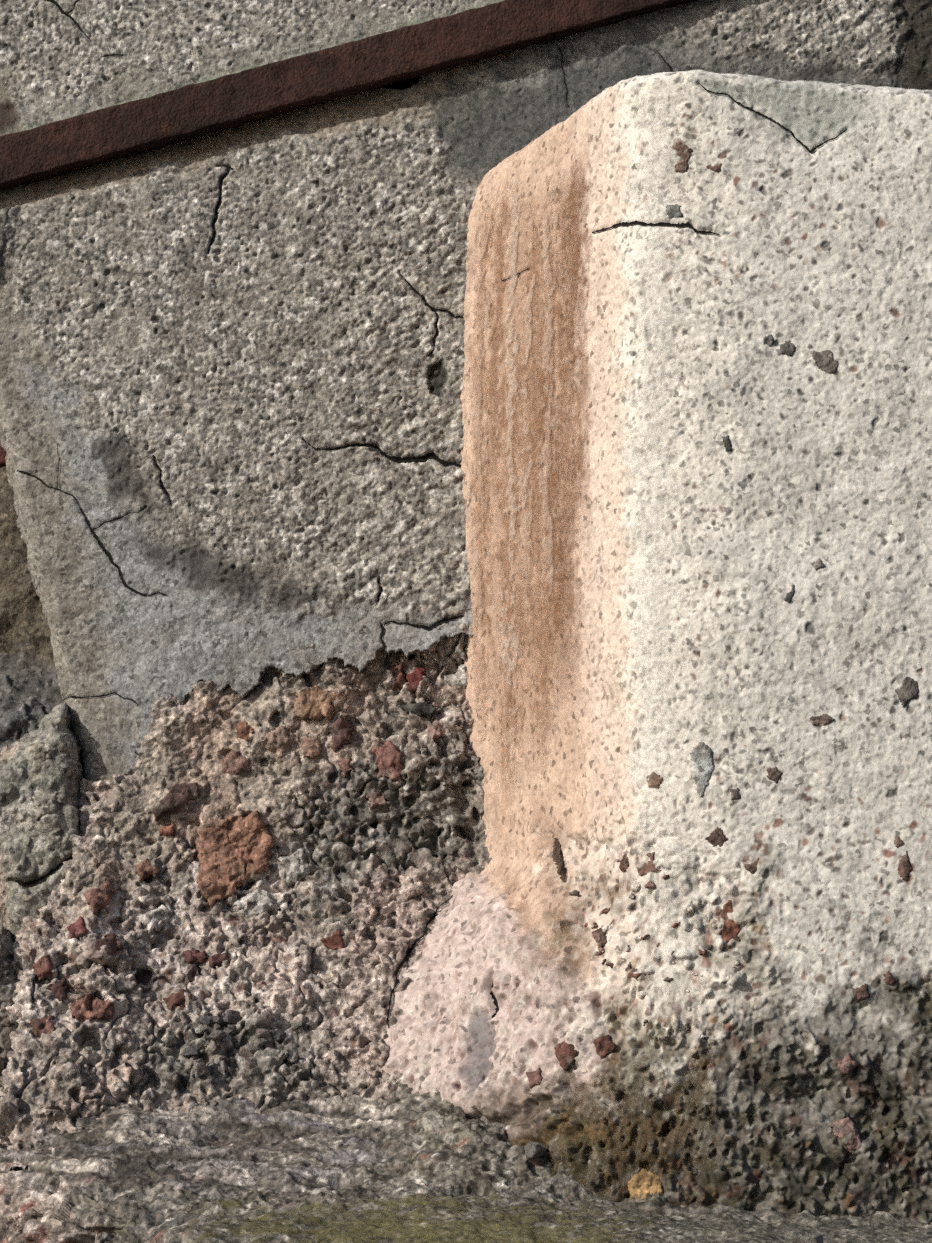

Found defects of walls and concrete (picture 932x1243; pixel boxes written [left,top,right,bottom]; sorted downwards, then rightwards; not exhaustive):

crack [48,0,127,57]
crack [656,50,847,153]
crack [208,165,233,252]
crack [592,220,720,235]
crack [303,439,461,467]
corrosion [471,194,579,636]
crack [16,446,172,596]
corrosion [501,610,518,686]
spalling [0,623,492,1170]
crack [387,895,453,1028]